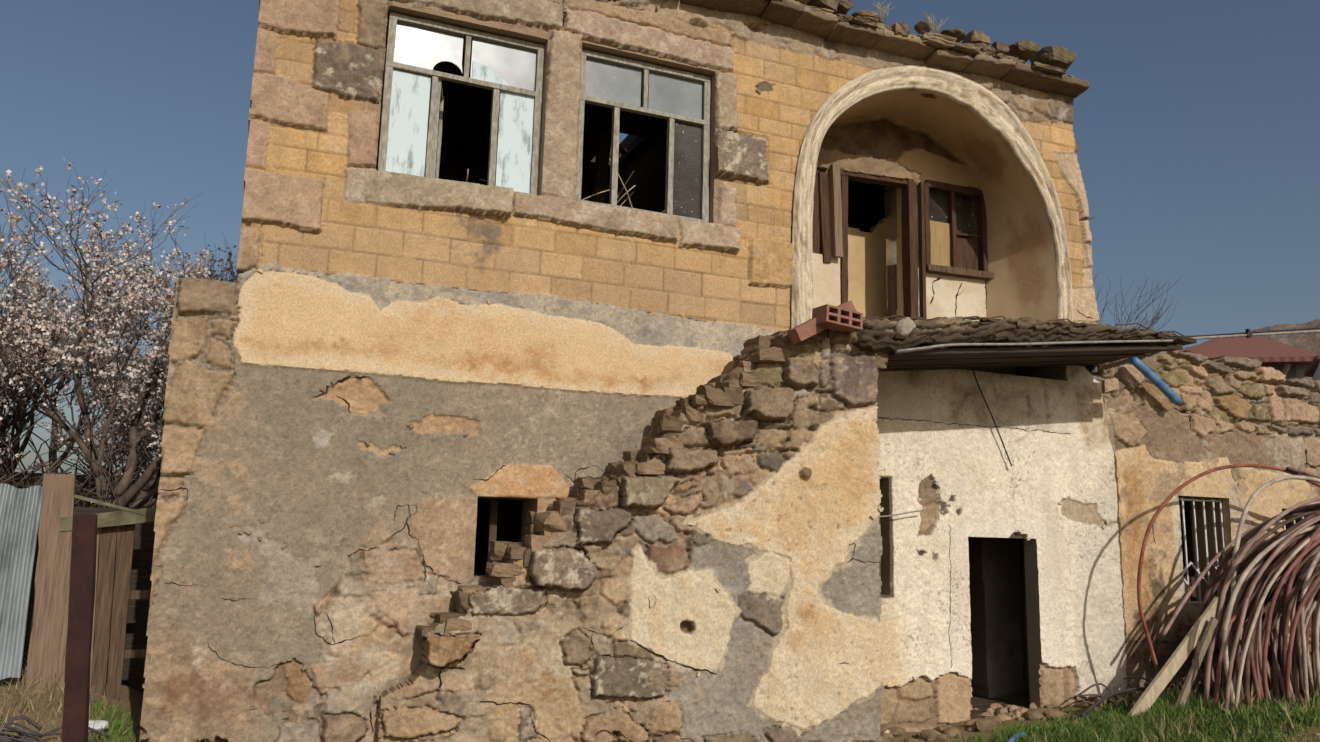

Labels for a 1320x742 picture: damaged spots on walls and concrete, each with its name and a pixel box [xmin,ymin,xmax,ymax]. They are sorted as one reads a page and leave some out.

peeling [820,116,964,164]
peeling [230,263,828,356]
crack [930,275,987,314]
spalling [316,375,391,415]
spalling [313,429,335,447]
spalling [407,412,482,436]
peeling [917,473,962,560]
peeling [1058,496,1117,529]
crack [348,504,461,584]
crack [314,605,358,645]
peeling [667,507,973,742]